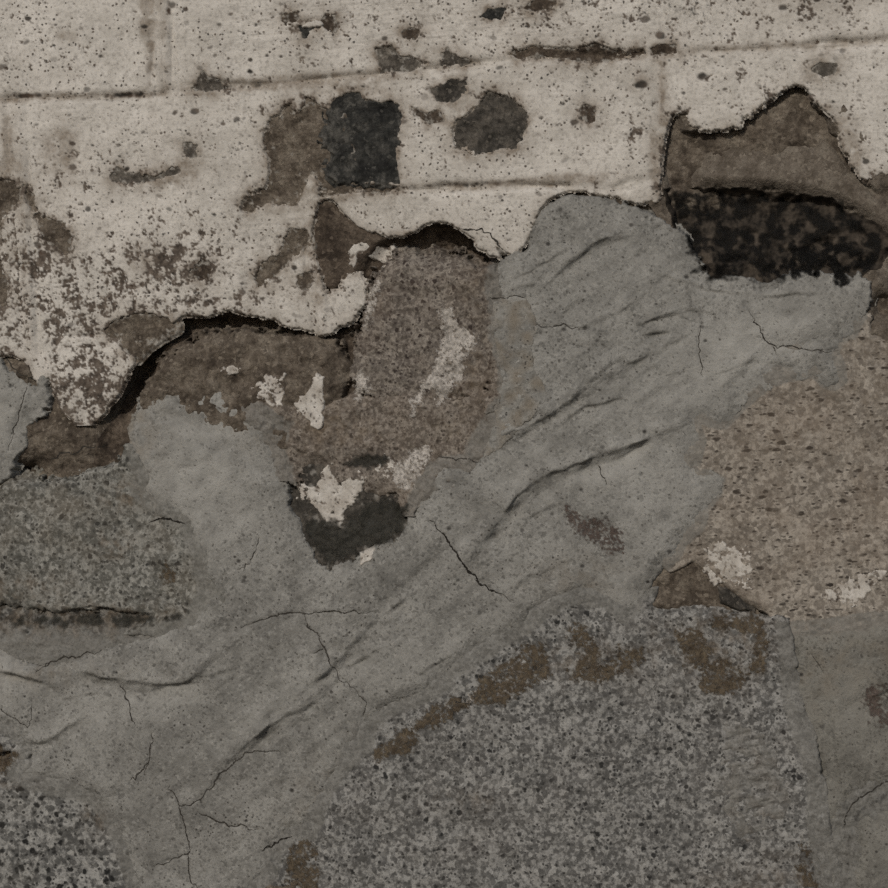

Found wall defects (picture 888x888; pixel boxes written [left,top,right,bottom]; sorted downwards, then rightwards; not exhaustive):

spalling [193,70,227,92]
spalling [375,46,426,74]
spalling [440,47,472,67]
spalling [454,91,529,155]
spalling [0,179,72,306]
spalling [93,79,505,467]
spalling [648,86,888,343]
spalling [290,445,433,571]
crack [430,520,508,599]
crack [244,609,374,714]
crack [120,686,153,781]
crack [156,750,292,885]